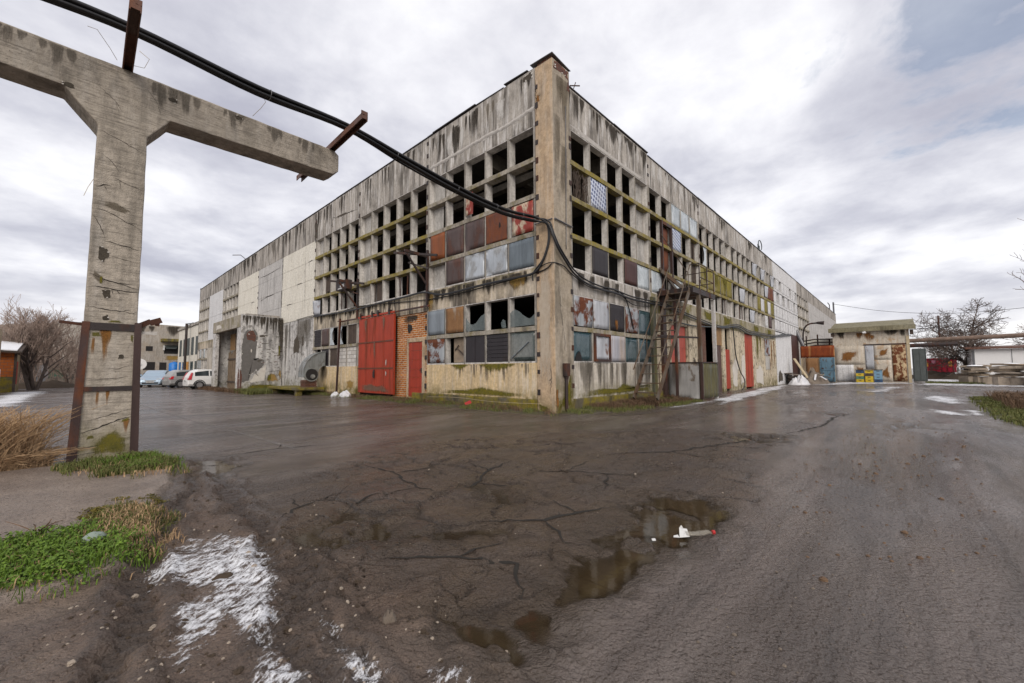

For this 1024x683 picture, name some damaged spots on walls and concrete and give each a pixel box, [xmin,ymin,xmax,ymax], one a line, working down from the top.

water stain [152,82,200,111]
water stain [432,99,503,155]
water stain [557,77,725,230]
crack [87,129,146,314]
rust [91,330,111,356]
spalling [239,329,304,388]